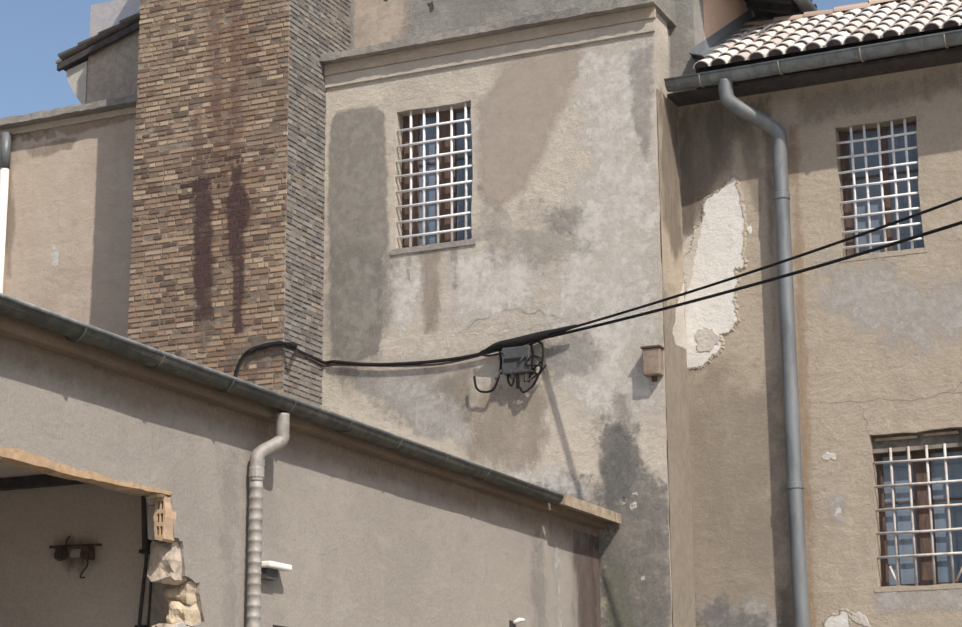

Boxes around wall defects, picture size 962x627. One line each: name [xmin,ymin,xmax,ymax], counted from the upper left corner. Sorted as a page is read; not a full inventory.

damp [326,108,399,384]
peeling [672,174,752,371]
spalling [0,447,201,627]
damp [538,291,782,627]
peeling [822,608,871,627]